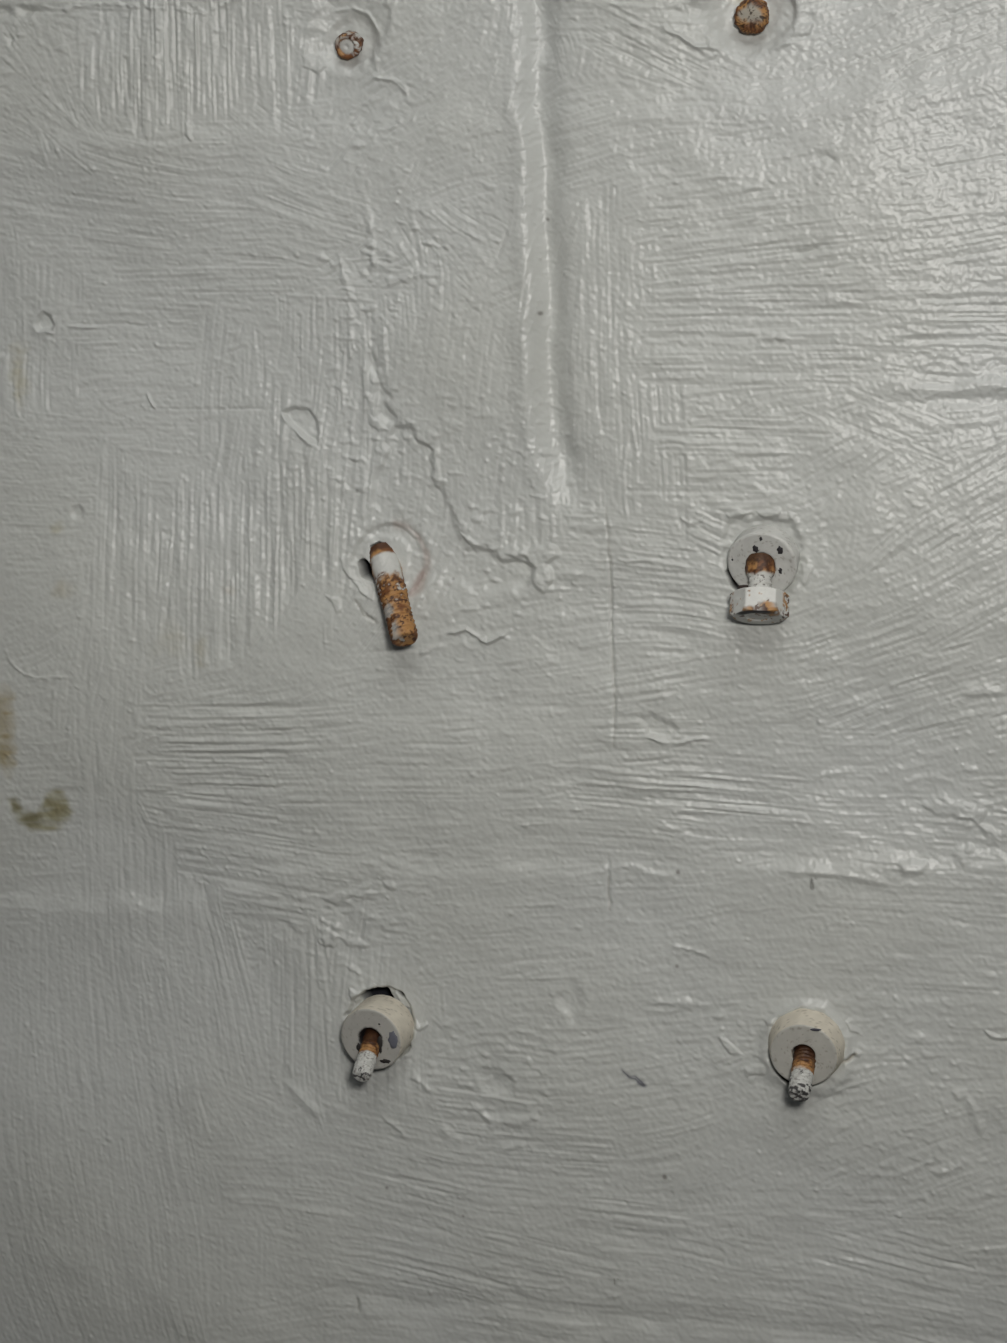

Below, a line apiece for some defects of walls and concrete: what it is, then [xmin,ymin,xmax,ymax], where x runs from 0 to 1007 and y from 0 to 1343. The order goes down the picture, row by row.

water stain [5,787,77,834]